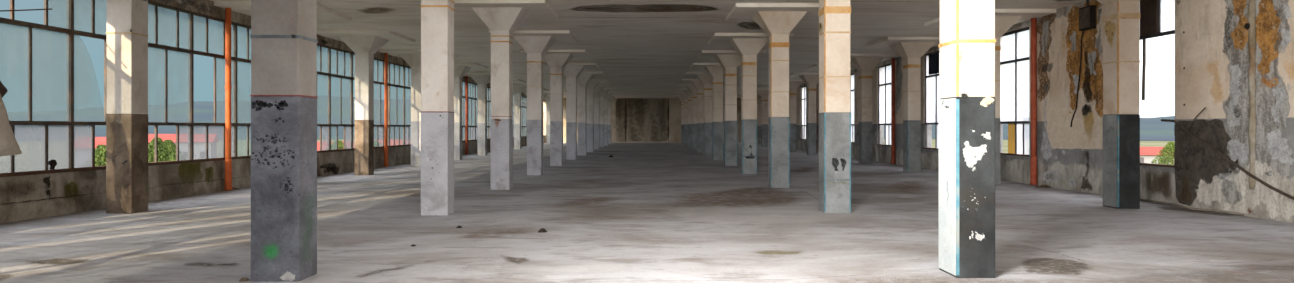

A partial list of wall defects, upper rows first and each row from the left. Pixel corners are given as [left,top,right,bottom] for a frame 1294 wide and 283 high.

peeling [963,130,991,171]
peeling [1037,0,1103,160]
peeling [1206,0,1294,177]